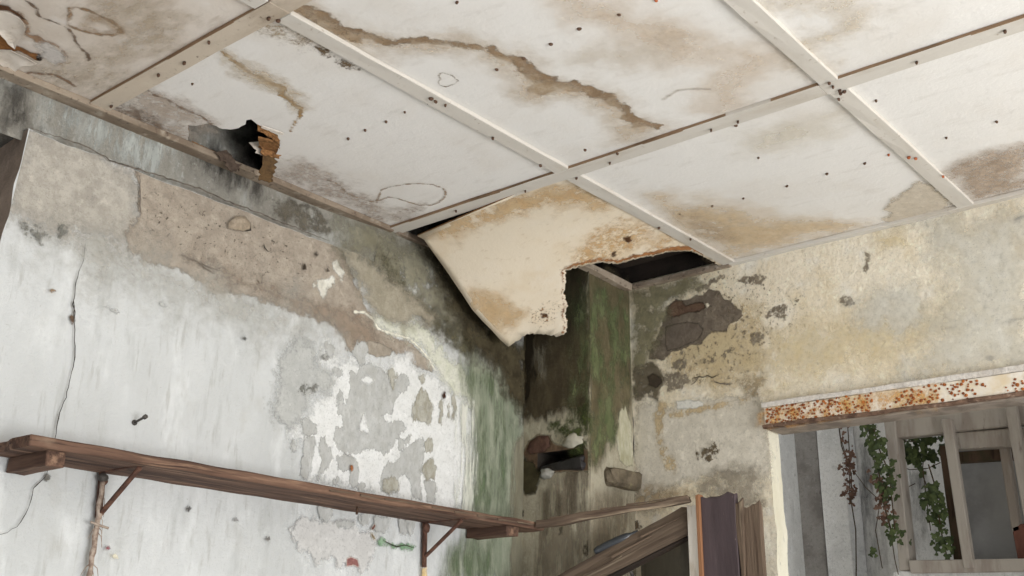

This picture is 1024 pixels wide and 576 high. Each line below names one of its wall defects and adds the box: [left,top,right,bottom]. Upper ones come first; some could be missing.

water stain [17,0,164,87]
water stain [266,25,360,71]
water stain [294,5,664,135]
water stain [951,147,1024,198]
water stain [676,210,847,254]
crack [55,249,85,438]
peeling [10,131,476,508]
water stain [274,165,678,576]
peeling [649,272,805,391]
rust [760,378,1024,429]
crack [0,471,51,535]